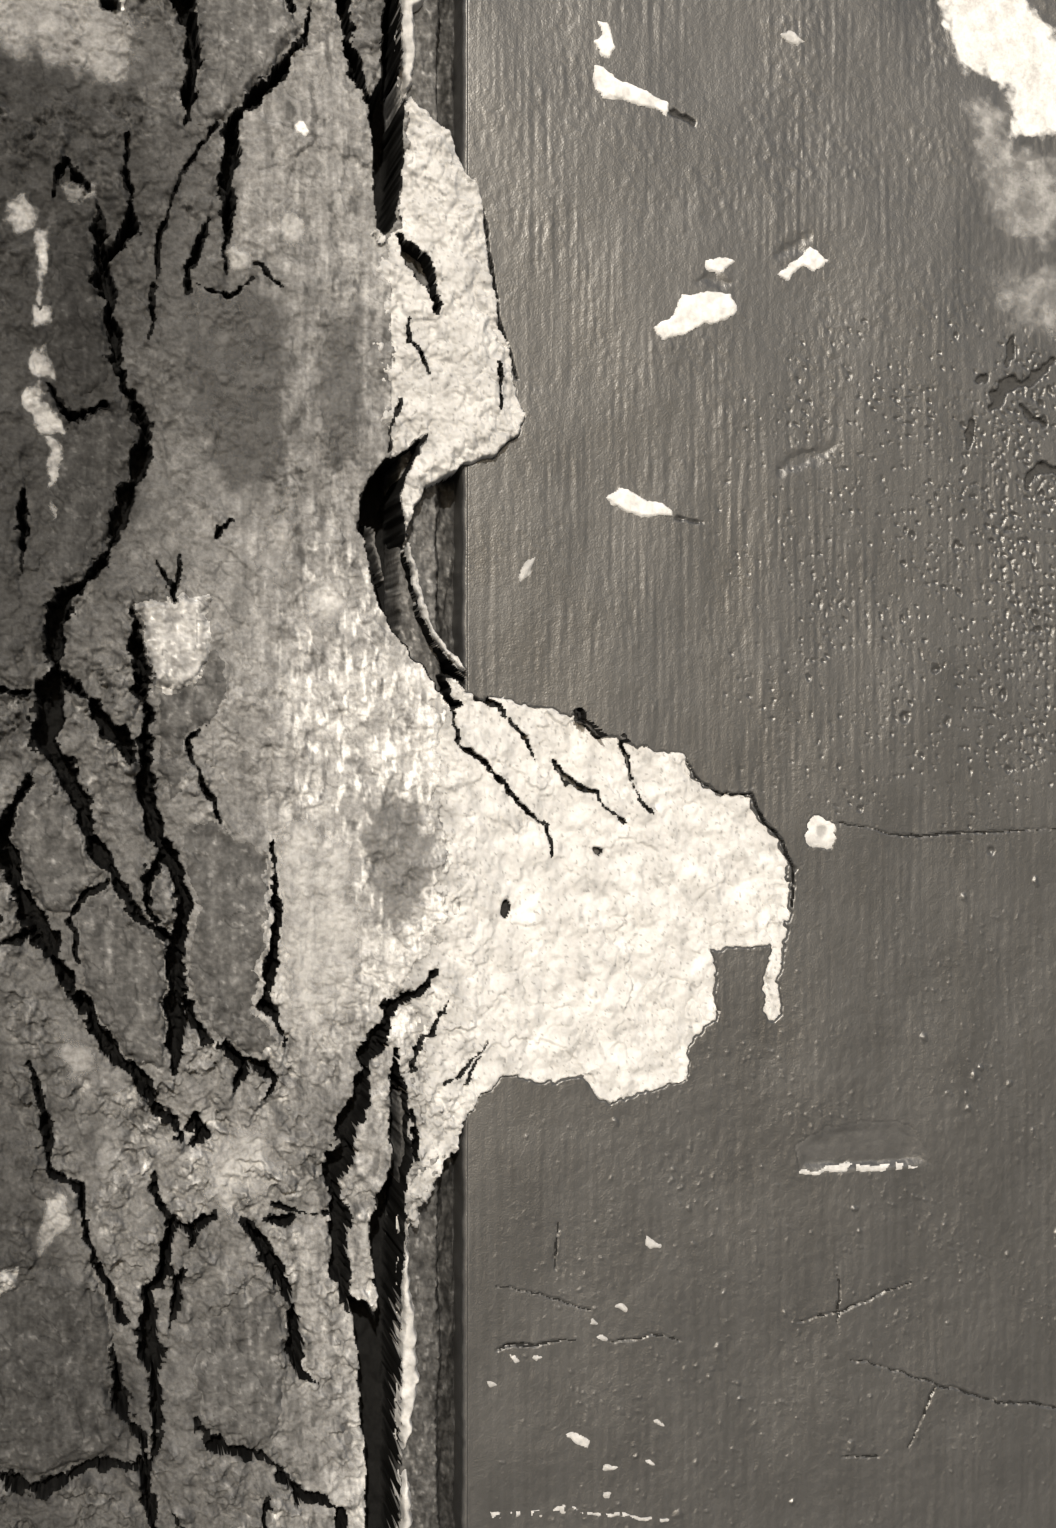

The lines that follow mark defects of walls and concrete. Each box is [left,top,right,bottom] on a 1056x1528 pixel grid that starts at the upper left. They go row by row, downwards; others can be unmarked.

peeling [593,21,695,126]
spalling [772,230,828,281]
crack [0,0,654,1148]
spalling [370,92,790,1228]
crack [839,822,1056,837]
crack [0,968,489,1528]
crack [495,1222,678,1351]
crack [801,1274,912,1322]
crack [848,1359,1056,1458]